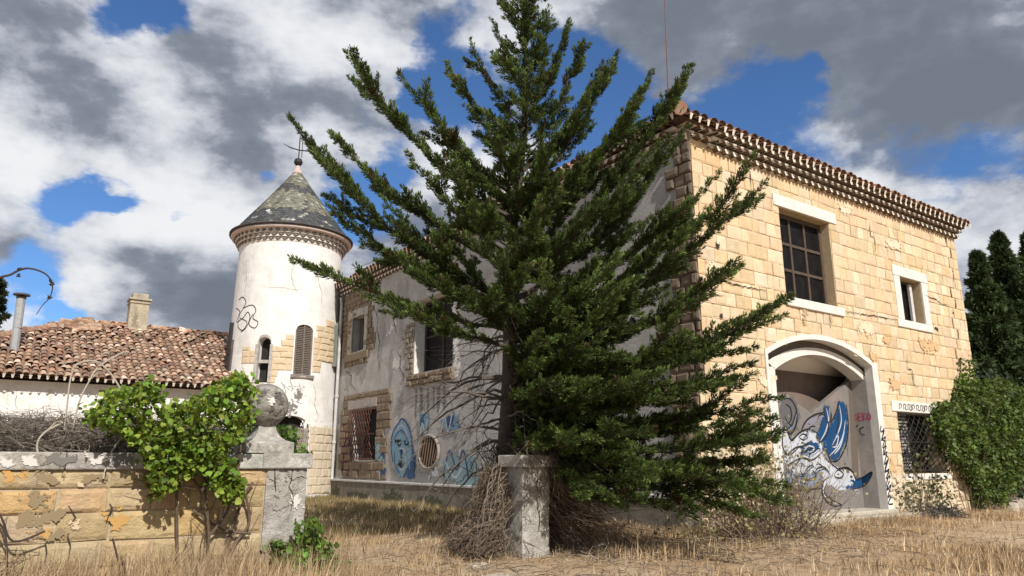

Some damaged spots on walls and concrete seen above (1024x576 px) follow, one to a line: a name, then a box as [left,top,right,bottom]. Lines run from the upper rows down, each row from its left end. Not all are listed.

peeling [257,287,415,412]